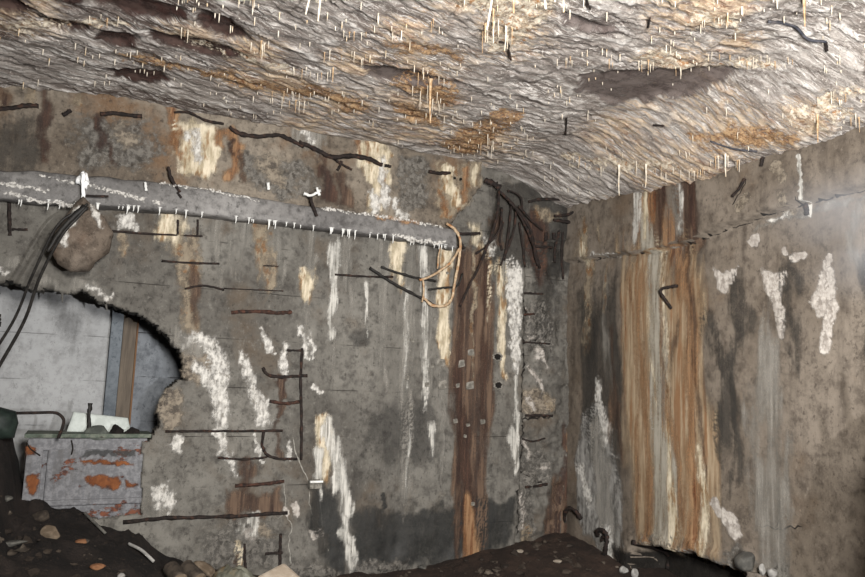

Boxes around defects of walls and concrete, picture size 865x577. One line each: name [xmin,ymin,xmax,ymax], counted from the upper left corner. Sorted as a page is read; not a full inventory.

leakage [0,17,129,39]
rust [222,126,246,182]
rust [449,242,495,559]
leakage [469,183,570,474]
spalling [522,292,556,417]
leakage [575,216,746,577]
rust [616,181,726,568]
leakage [714,275,789,577]
leakage [779,264,802,345]
leakage [234,511,259,566]
spalling [517,438,551,541]